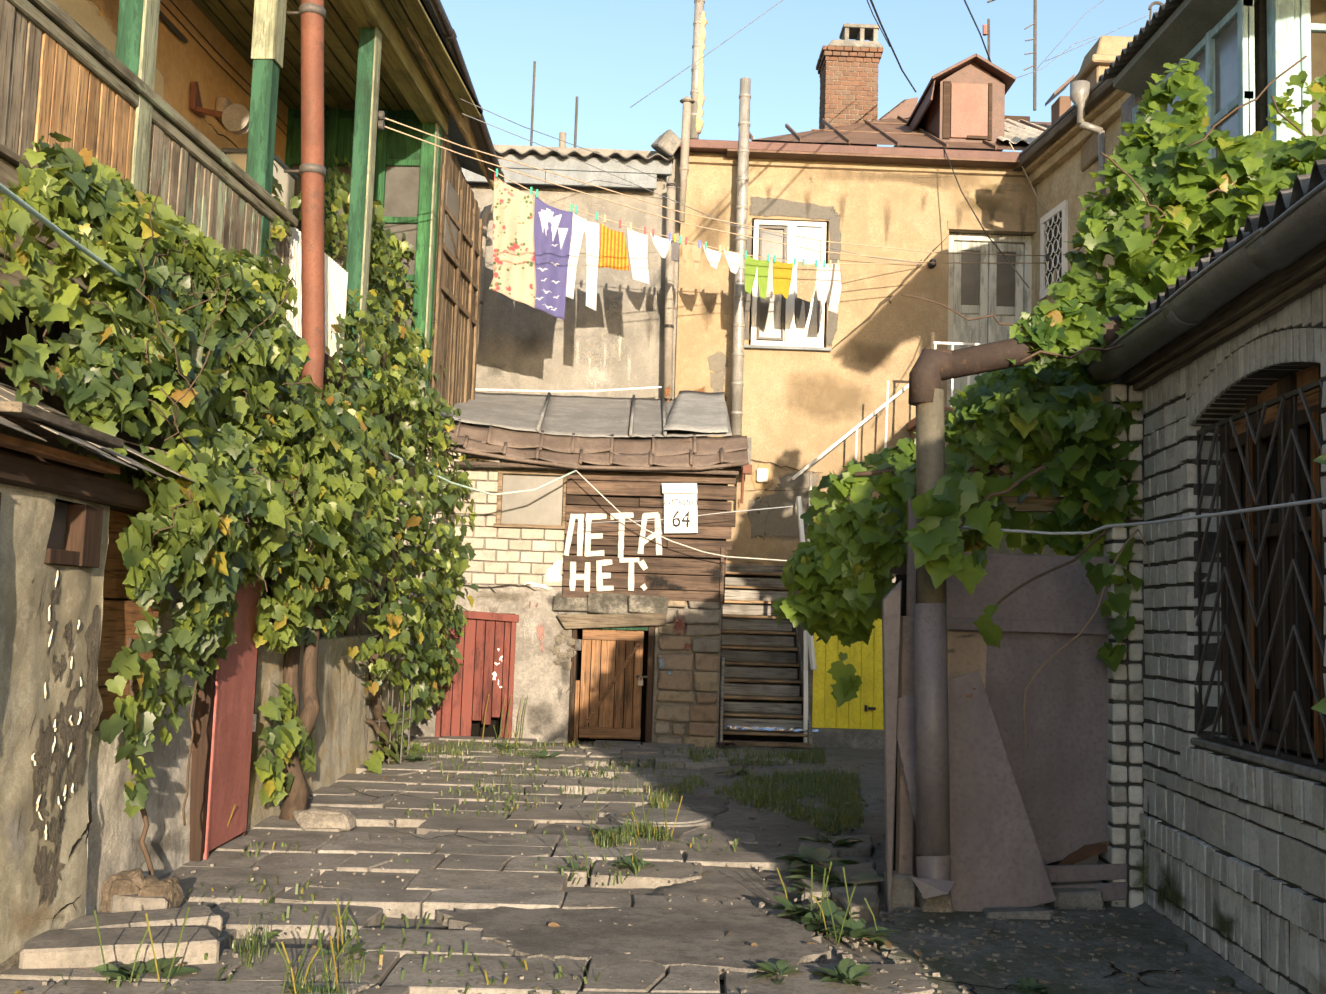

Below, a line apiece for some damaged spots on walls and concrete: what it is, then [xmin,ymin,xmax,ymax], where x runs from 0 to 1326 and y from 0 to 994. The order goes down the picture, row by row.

peeling [29,568,103,907]
crack [68,793,92,862]